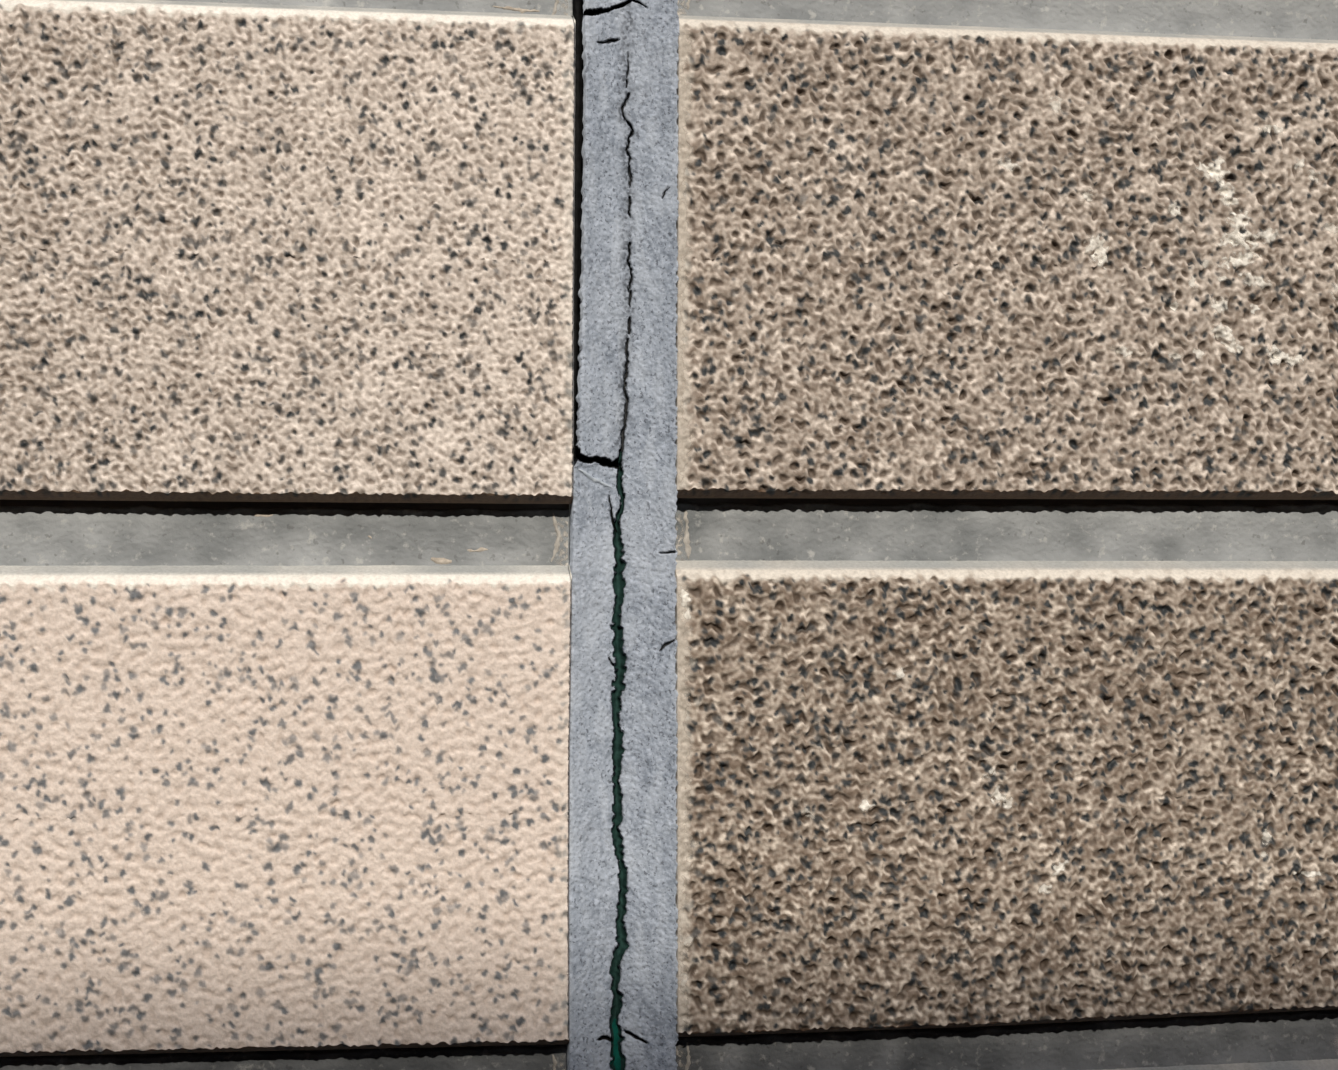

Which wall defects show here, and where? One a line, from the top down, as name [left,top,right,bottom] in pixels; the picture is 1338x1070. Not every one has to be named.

crack [574,0,668,1070]